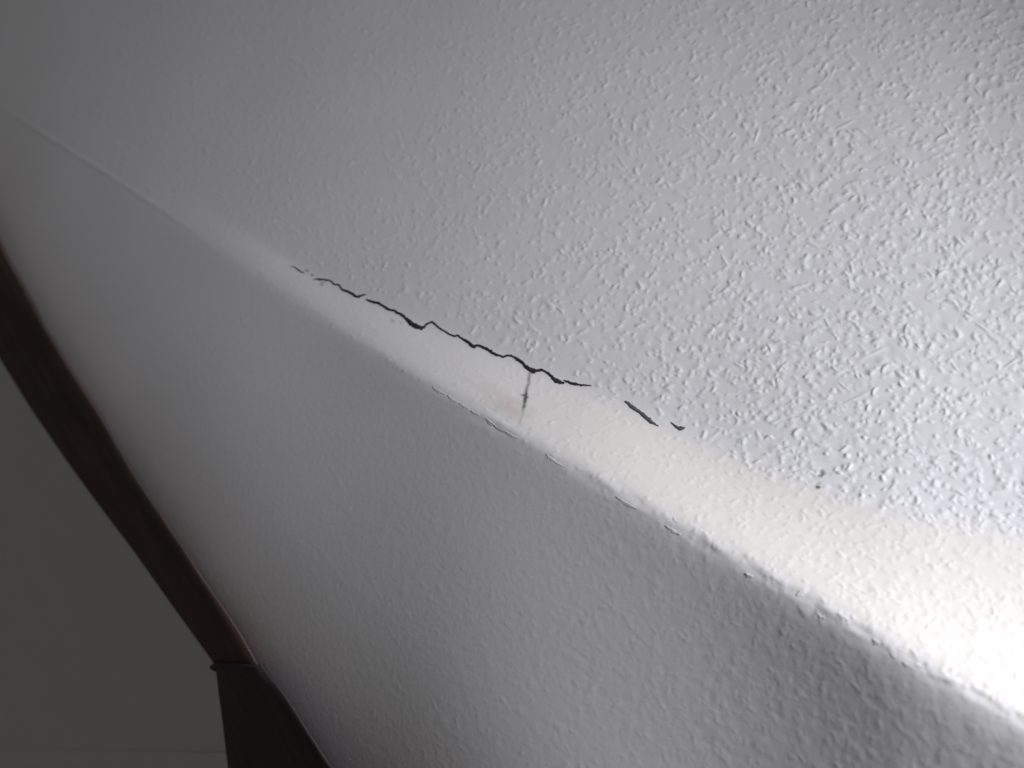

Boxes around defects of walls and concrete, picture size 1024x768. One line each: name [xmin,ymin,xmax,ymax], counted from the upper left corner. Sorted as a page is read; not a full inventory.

crack [291,266,591,408]
crack [625,401,685,431]